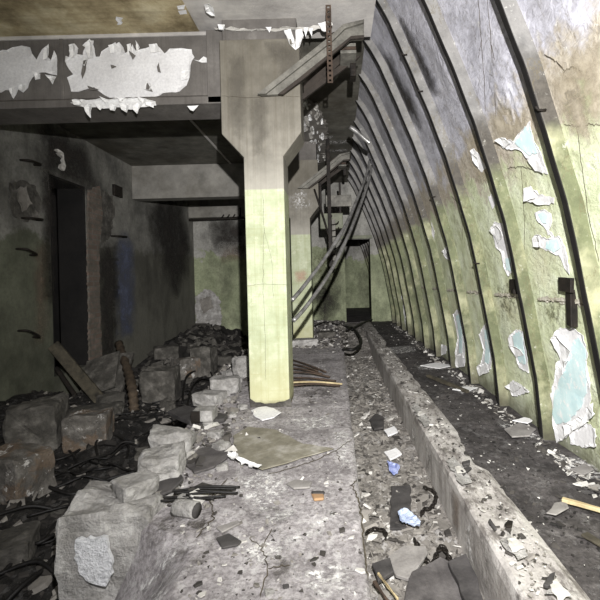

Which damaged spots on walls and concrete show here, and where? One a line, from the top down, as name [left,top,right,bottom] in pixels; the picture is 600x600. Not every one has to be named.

peeling [215,21,333,50]
peeling [0,44,57,99]
peeling [65,39,207,118]
peeling [470,148,486,172]
peeling [494,121,548,174]
peeling [489,222,512,276]
peeling [523,186,570,274]
peeling [453,310,465,368]
peeling [477,323,492,376]
peeling [508,329,529,373]
peeling [550,327,597,448]
crack [250,529,289,597]